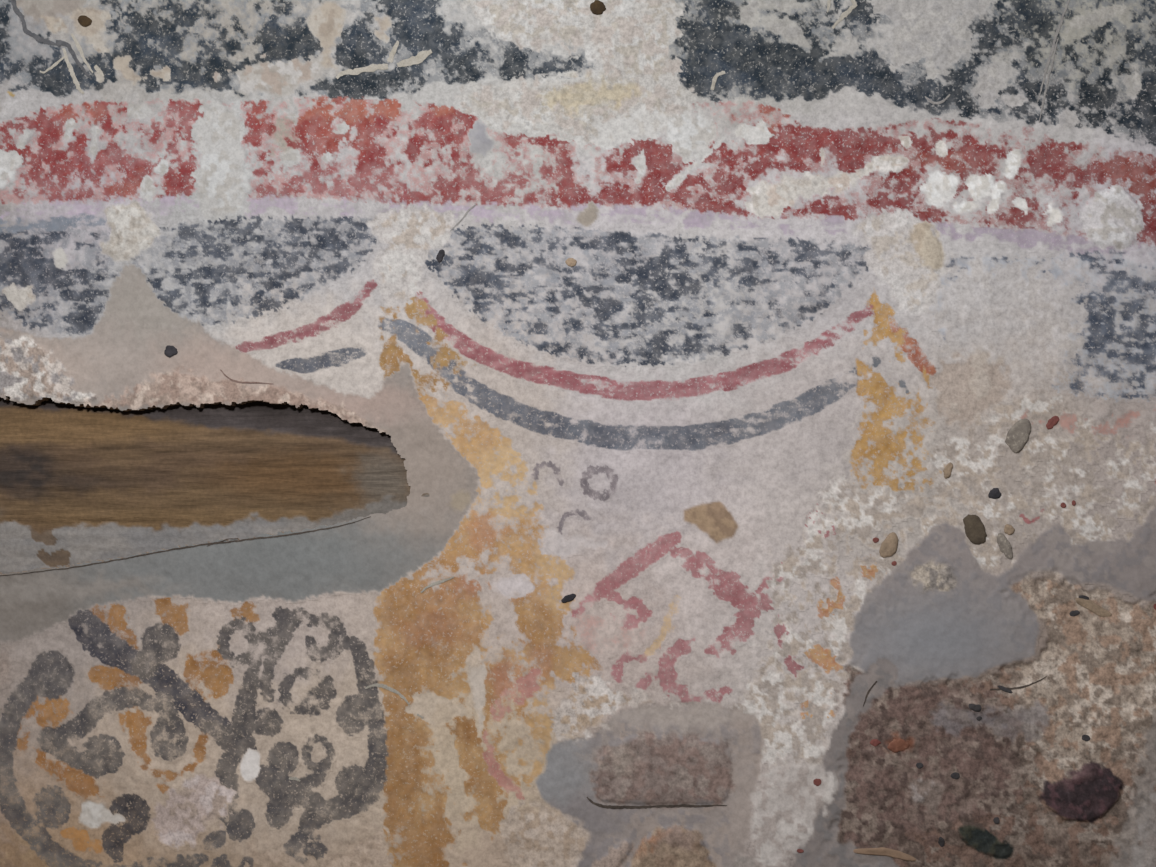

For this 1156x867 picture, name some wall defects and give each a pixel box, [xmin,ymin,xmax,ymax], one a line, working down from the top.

spalling [0,329,389,434]
spalling [732,134,1156,867]